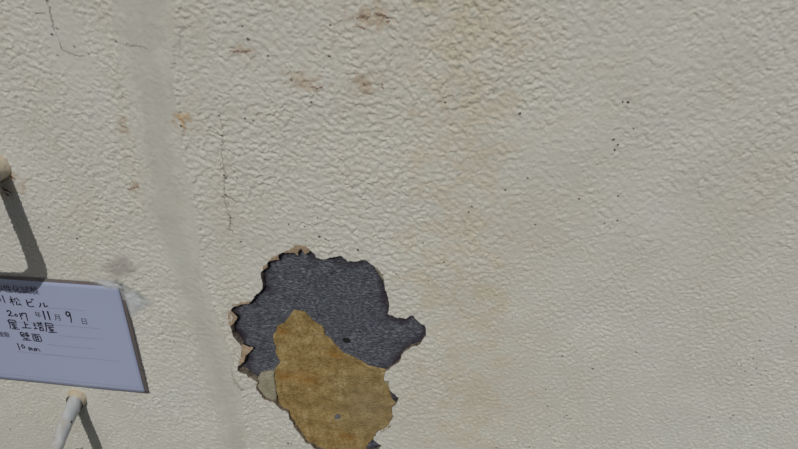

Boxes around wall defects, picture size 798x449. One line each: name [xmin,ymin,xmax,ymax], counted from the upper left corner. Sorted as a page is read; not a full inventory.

crack [207,115,240,235]
peeling [228,245,426,449]